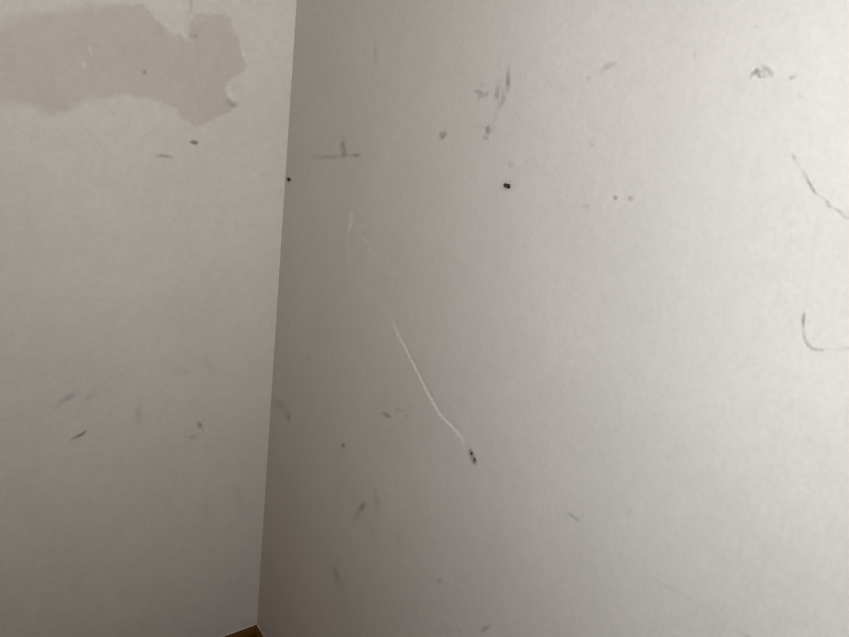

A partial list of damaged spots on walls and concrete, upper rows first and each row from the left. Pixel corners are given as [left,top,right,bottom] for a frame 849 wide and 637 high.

peeling [0,0,249,130]